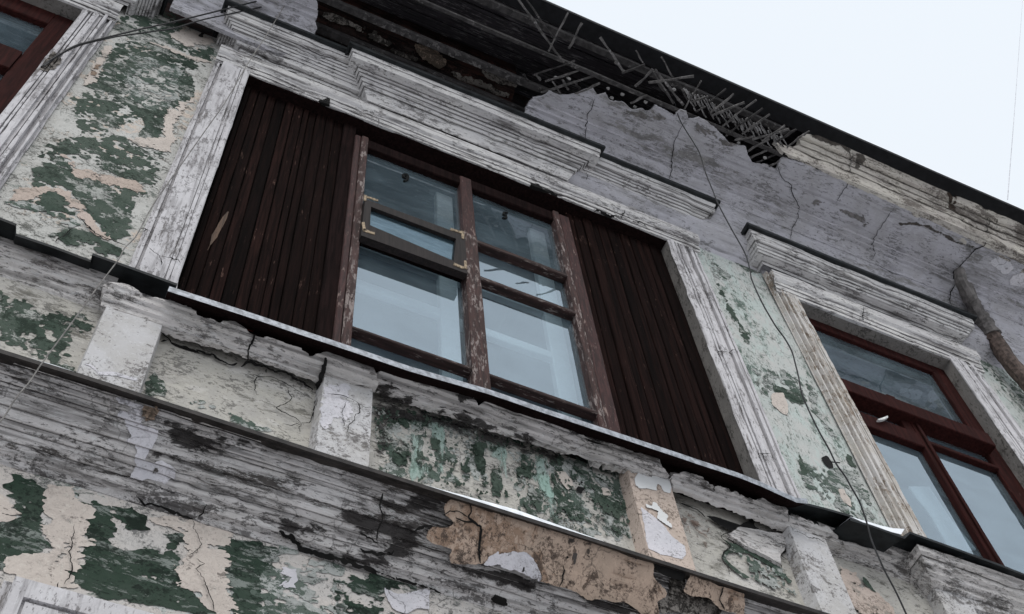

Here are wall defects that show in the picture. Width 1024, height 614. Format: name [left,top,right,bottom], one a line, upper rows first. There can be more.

peeling [5,12,214,257]
crack [779,171,800,239]
peeling [709,259,760,344]
crack [949,218,990,304]
peeling [0,290,176,484]
crack [161,332,368,430]
peeling [752,368,837,437]
crack [137,497,214,609]
peeling [0,474,430,614]
crack [279,493,483,594]
flaking render [371,404,686,614]
peeling [797,452,875,523]